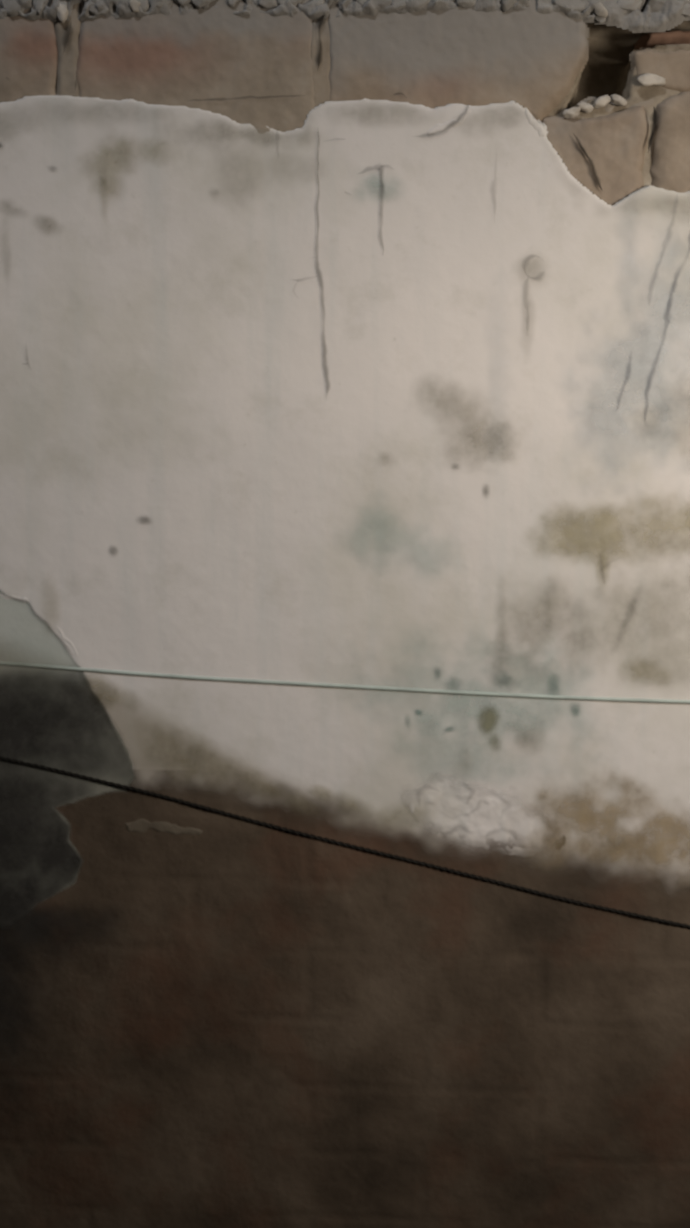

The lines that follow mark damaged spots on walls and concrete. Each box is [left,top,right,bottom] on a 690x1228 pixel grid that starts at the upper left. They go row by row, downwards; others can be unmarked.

flaking render [0,0,690,205]
flaking render [0,591,690,1228]